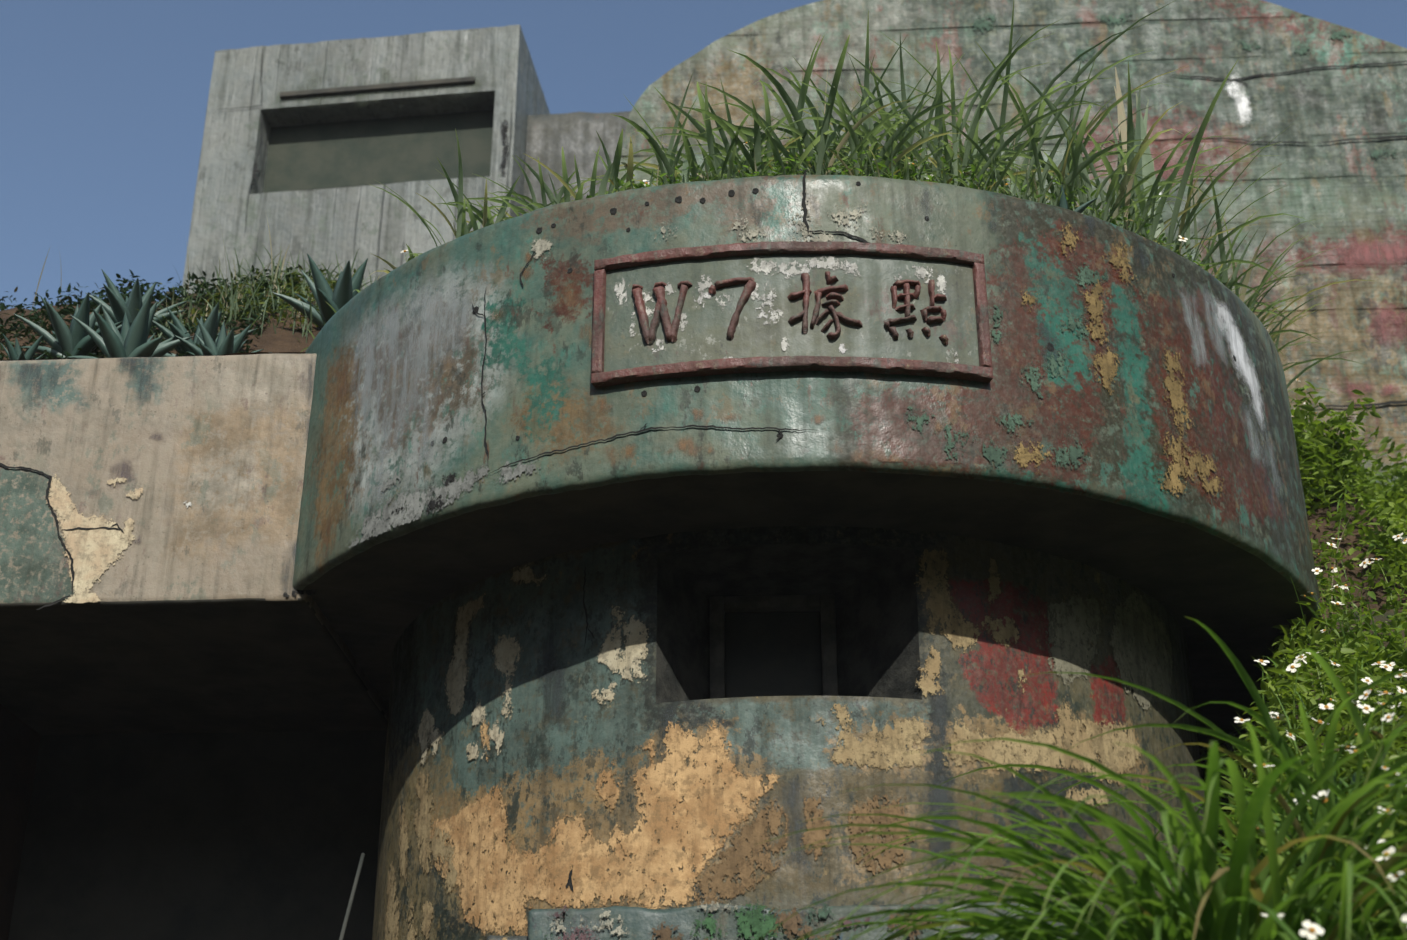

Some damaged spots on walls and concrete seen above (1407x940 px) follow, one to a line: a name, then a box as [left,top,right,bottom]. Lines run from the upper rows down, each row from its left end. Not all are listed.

crack [802,170,870,243]
crack [472,290,819,473]
peeling [45,474,135,603]
peeling [107,477,143,500]
peeling [444,591,524,764]
peeling [591,601,649,704]
peeling [914,548,1020,701]
peeling [385,703,936,940]